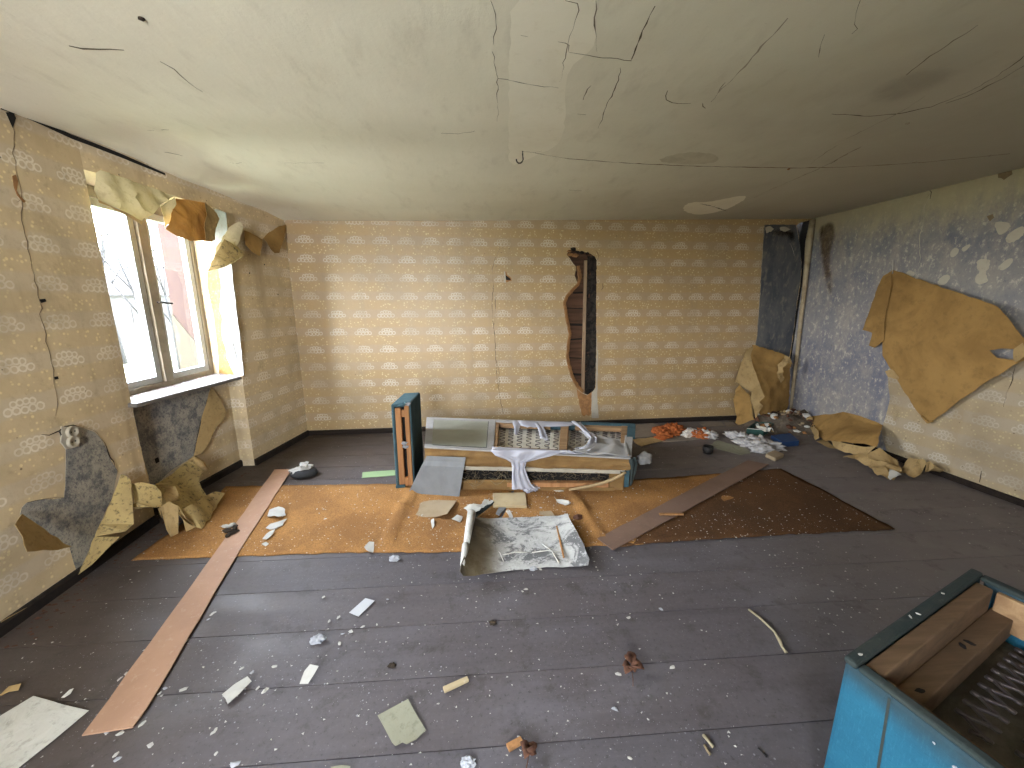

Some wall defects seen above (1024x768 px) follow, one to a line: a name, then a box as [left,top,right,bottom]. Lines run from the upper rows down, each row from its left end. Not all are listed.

crack [70,44,119,52]
crack [491,0,655,125]
crack [834,56,1024,116]
crack [533,151,720,167]
peeling [683,196,746,215]
spalling [987,214,1024,243]
crack [5,114,58,412]
spalling [975,258,1013,284]
spalling [563,247,599,418]
peeling [133,388,211,486]
peeling [15,427,134,575]